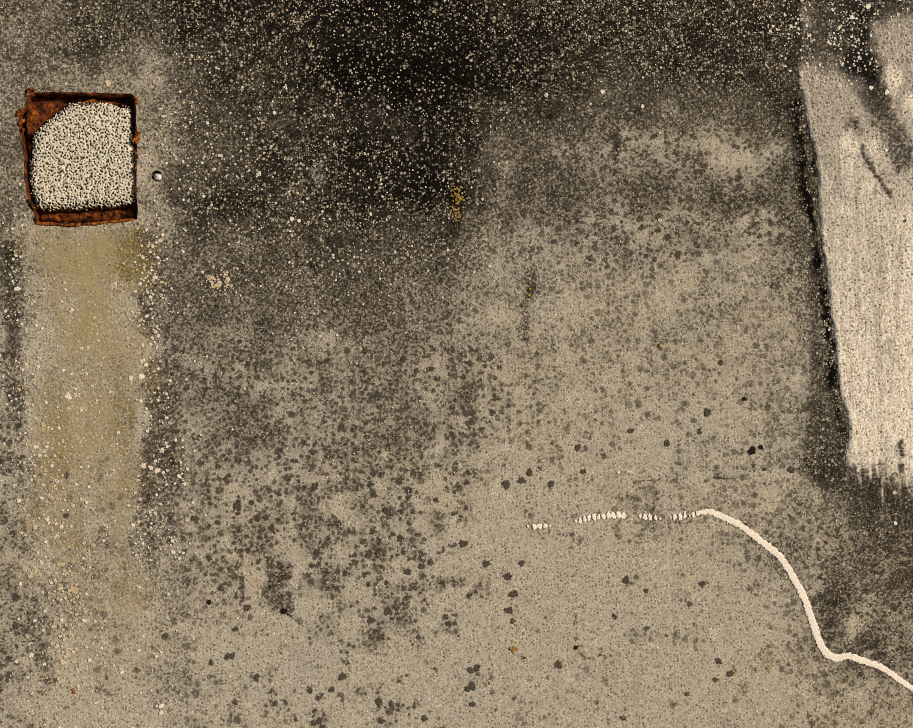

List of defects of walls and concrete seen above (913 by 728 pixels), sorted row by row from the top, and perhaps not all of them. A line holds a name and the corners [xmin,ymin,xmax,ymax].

leakage [37,0,913,566]
leakage [812,466,913,685]
leakage [843,659,901,690]